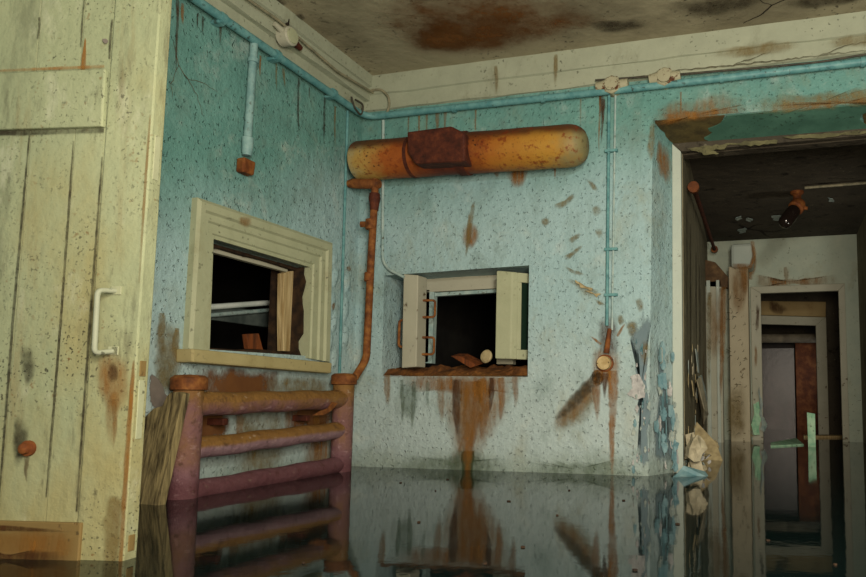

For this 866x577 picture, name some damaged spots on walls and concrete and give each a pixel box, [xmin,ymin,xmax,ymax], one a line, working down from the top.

leakage [415,0,572,48]
leakage [600,22,638,31]
peeling [655,104,866,155]
corrosion [466,206,476,248]
corrosion [420,377,504,470]
corrosion [594,367,617,457]
peeling [619,317,709,473]